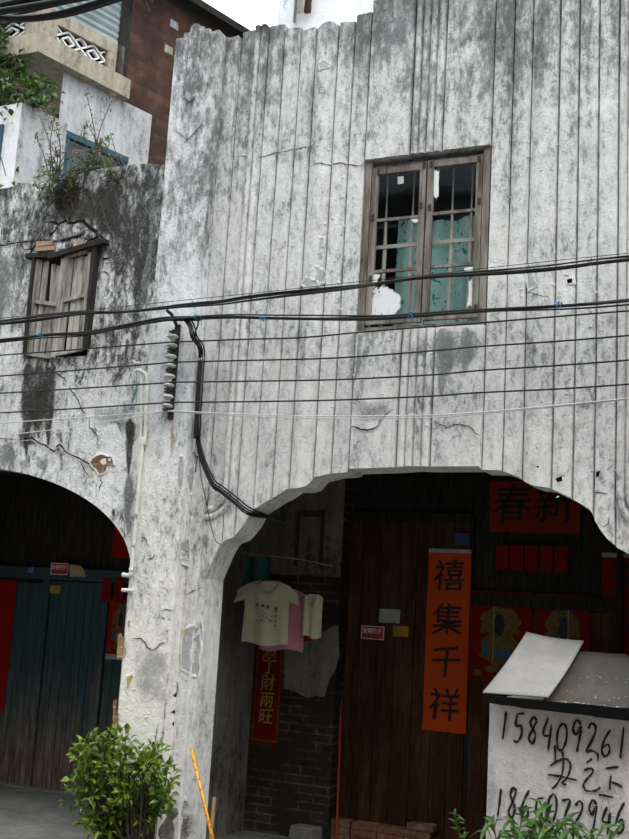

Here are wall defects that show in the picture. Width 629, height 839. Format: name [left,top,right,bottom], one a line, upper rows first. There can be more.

crack [238,138,364,167]
crack [0,219,117,274]
damp [1,364,55,468]
crack [0,367,116,489]
spalling [89,452,117,477]
spalling [175,536,191,567]
spalling [117,633,126,659]
spalling [179,619,204,683]
peeling [124,653,165,698]